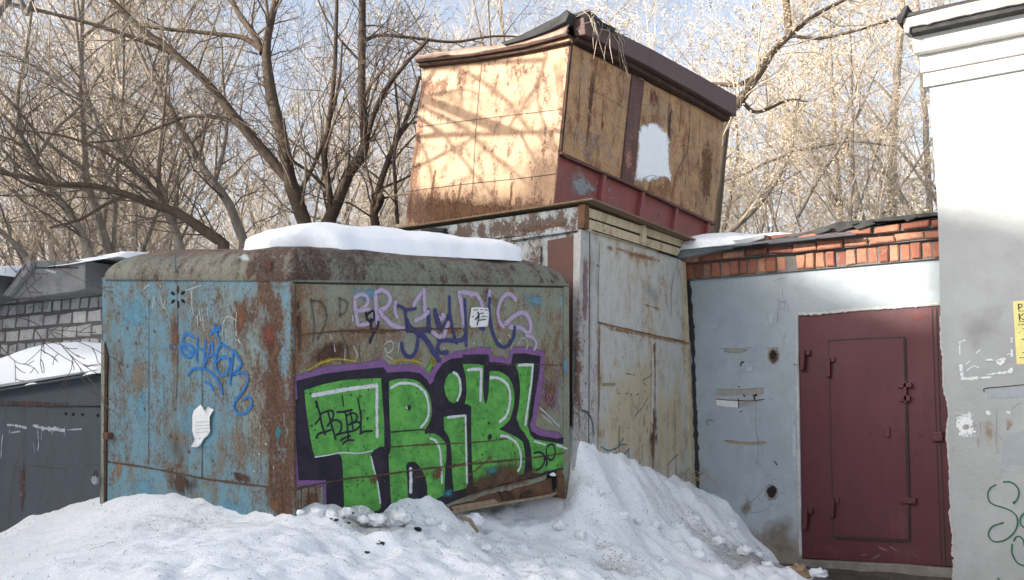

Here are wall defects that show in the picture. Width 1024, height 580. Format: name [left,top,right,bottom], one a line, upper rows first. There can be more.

corrosion [578,77,604,147]
corrosion [650,91,712,204]
corrosion [426,170,513,221]
corrosion [171,320,179,360]
corrosion [230,301,249,336]
corrosion [260,325,278,443]
corrosion [597,322,689,470]
corrosion [171,474,195,494]
corrosion [260,456,286,514]